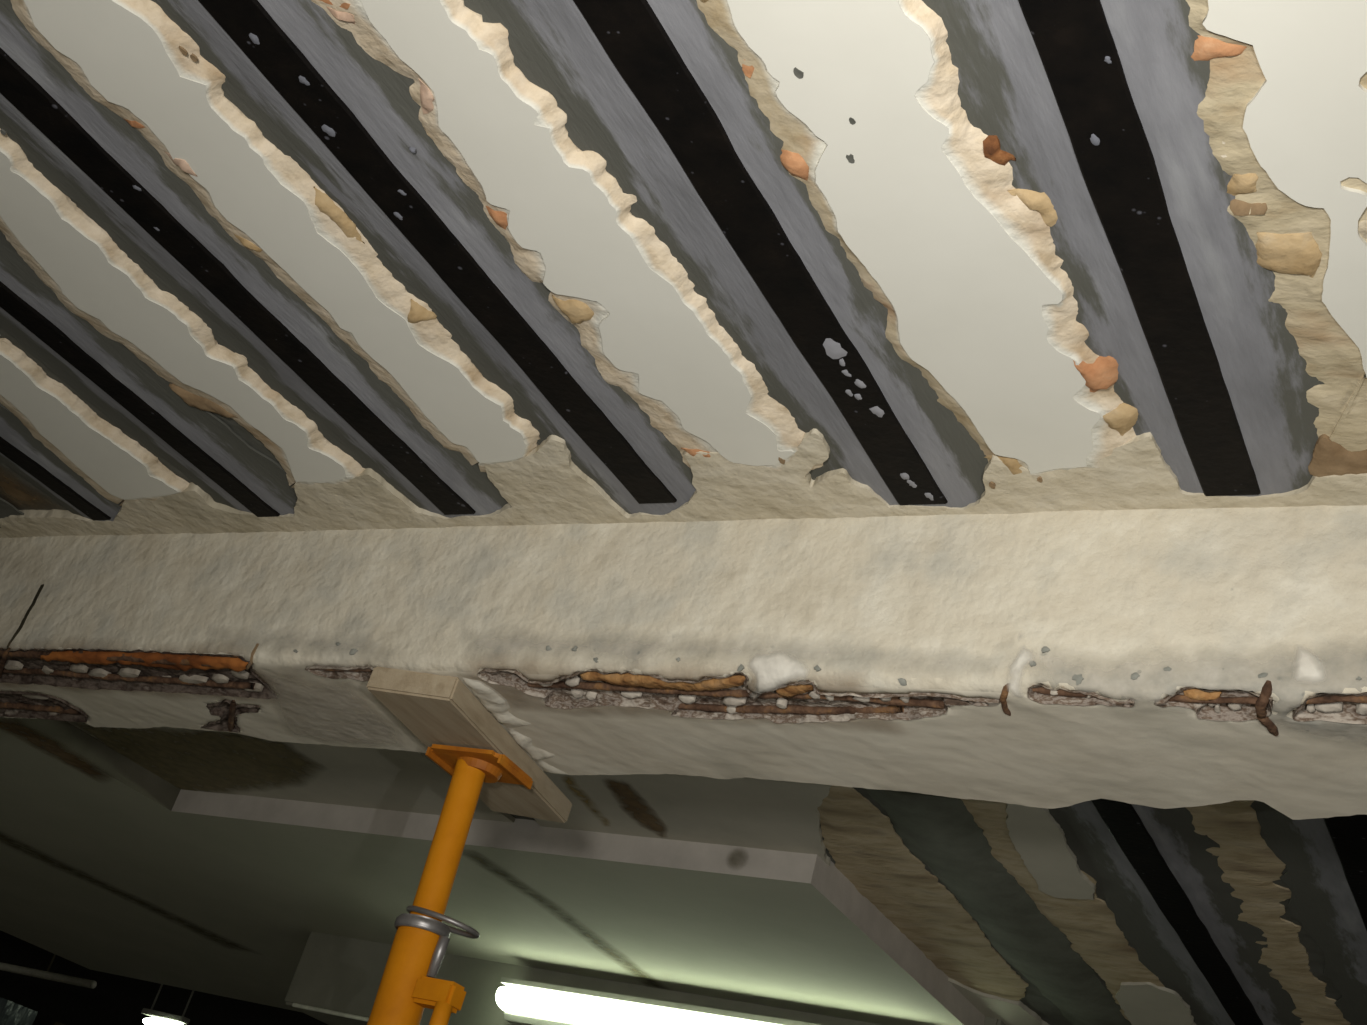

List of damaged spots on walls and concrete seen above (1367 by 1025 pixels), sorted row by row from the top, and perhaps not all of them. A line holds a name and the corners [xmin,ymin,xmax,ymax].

peeling [0,0,540,506]
peeling [311,0,805,471]
peeling [697,0,1138,483]
peeling [1186,0,1367,477]
crack [7,584,44,654]
spalling [0,647,278,732]
spalling [477,640,1011,724]
leakage [750,653,807,697]
spalling [1027,646,1367,740]
leakage [608,781,665,836]
peeling [817,785,1029,1001]
peeling [1185,800,1351,1025]